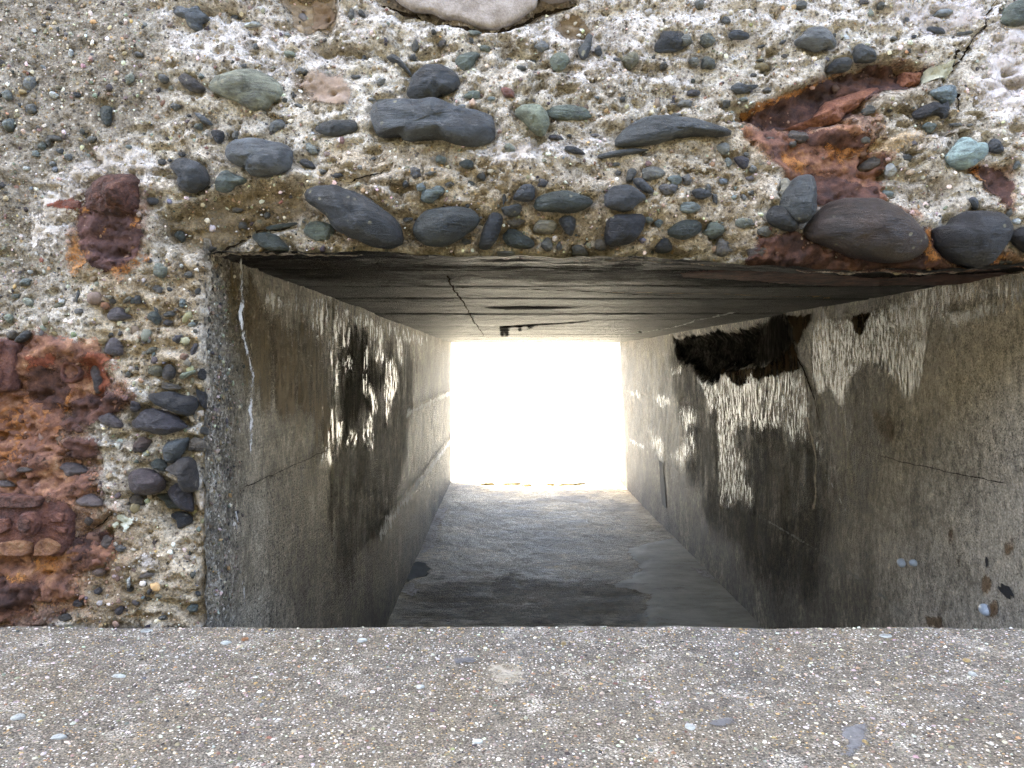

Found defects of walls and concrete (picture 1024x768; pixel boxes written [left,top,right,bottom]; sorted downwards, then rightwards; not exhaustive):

crack [942,2,995,112]
corrosion [738,76,924,206]
corrosion [968,165,1016,207]
corrosion [46,198,151,283]
water stain [216,261,427,465]
crack [446,275,672,336]
spalling [675,314,791,383]
corrosion [0,326,137,508]
water stain [379,435,454,540]
water stain [632,409,695,469]
water stain [697,274,1024,584]
crack [881,456,1003,483]